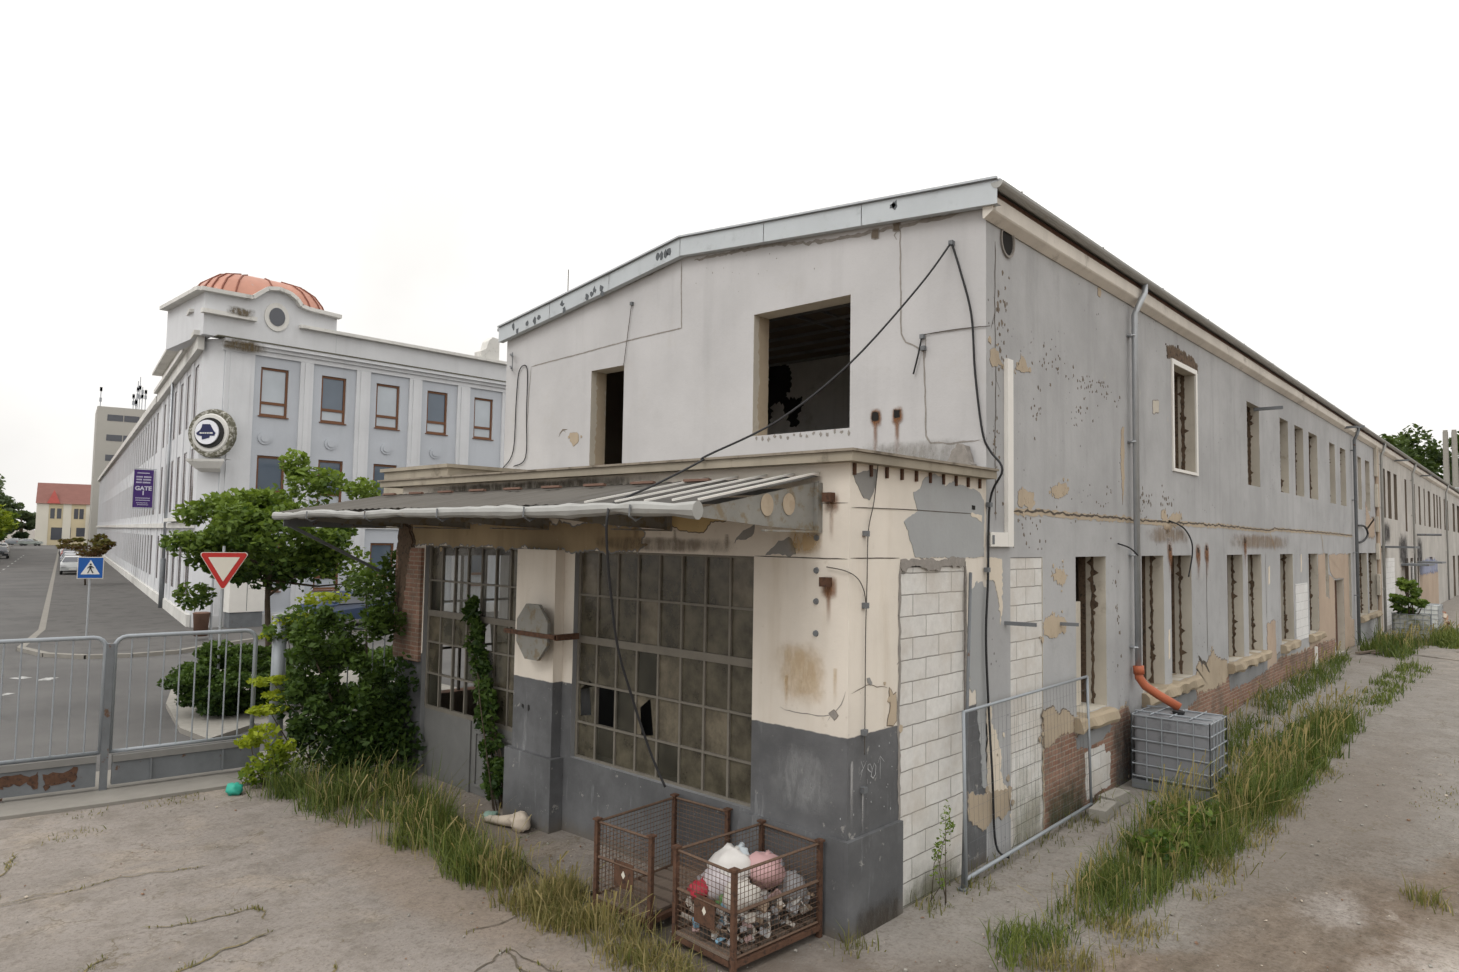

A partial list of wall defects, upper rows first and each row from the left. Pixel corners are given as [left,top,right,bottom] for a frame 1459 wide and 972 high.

rust [872,409,902,437]
peeling [988,270,1120,440]
peeling [904,426,1182,832]
flaking render [1173,553,1373,718]
rust [0,767,78,802]